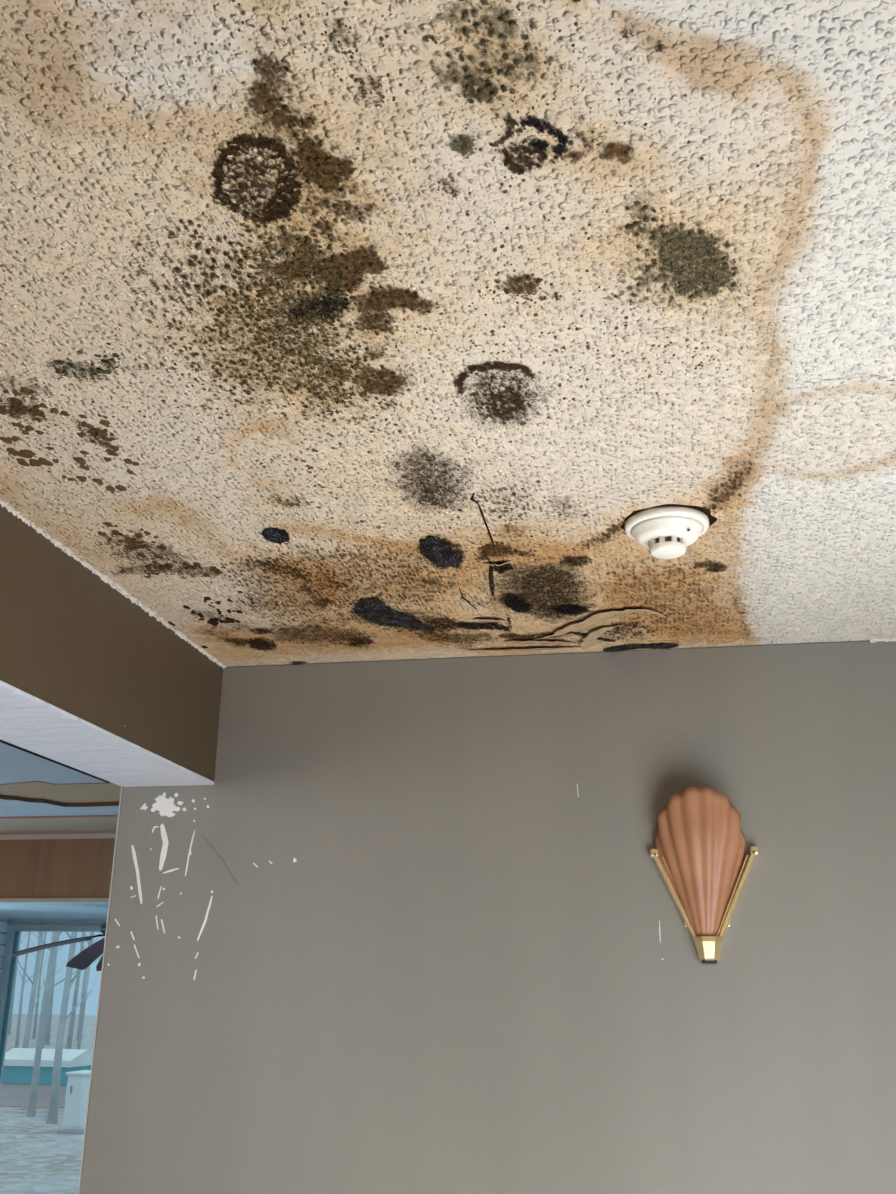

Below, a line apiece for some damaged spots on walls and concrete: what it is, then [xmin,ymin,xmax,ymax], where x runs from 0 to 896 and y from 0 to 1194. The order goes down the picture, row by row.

damp [0,0,896,667]
peeling [140,792,209,822]